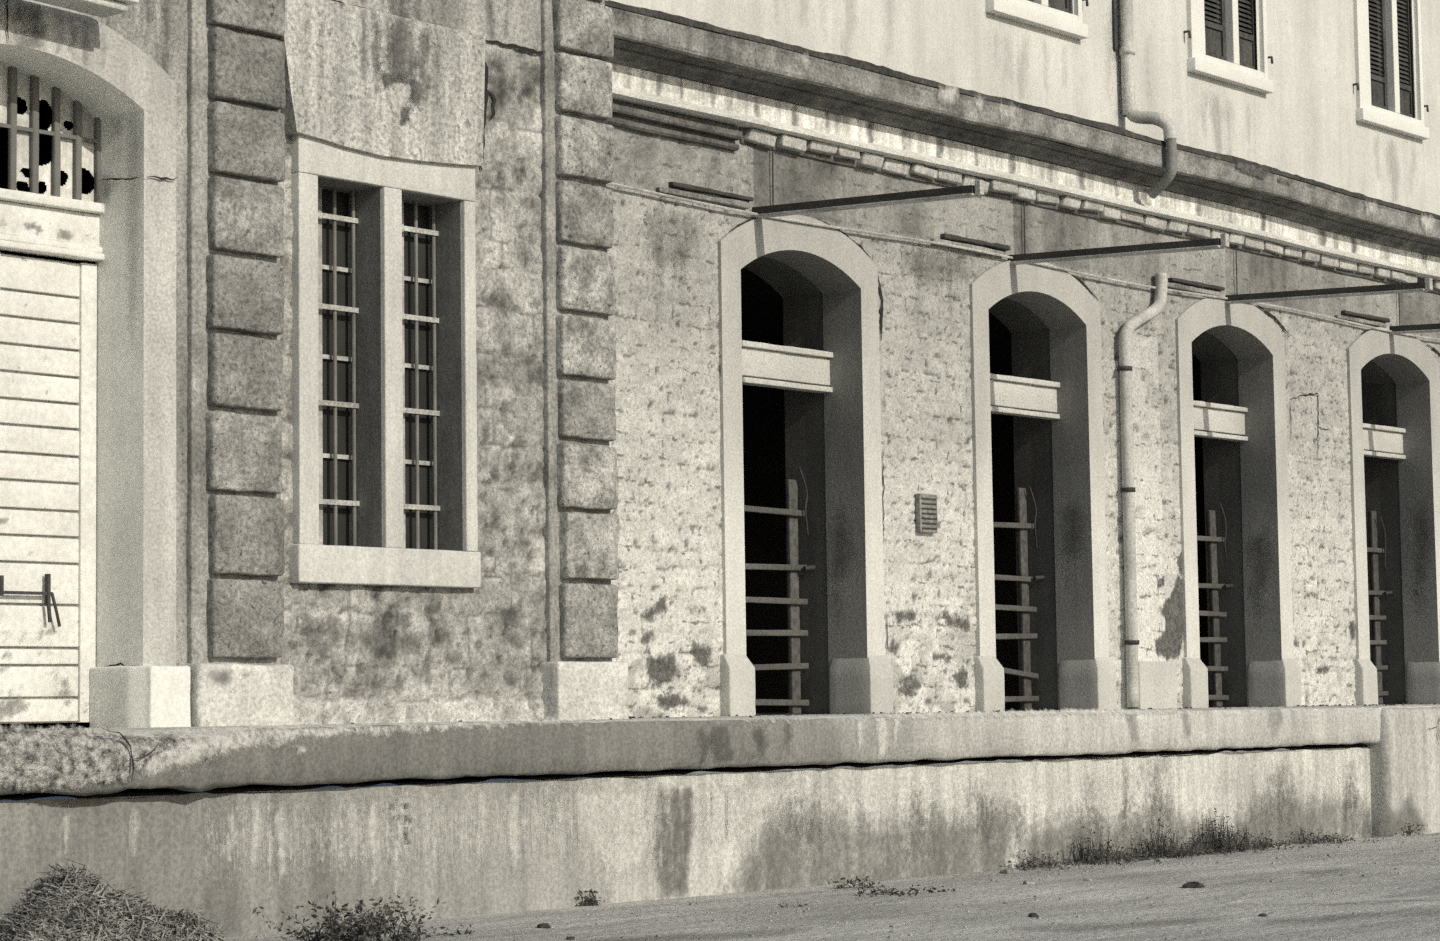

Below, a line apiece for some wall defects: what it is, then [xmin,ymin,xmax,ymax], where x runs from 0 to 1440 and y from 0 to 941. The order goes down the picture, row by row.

water stain [363,0,429,104]
water stain [222,783,1008,894]
water stain [1029,807,1213,866]
water stain [1238,798,1425,846]